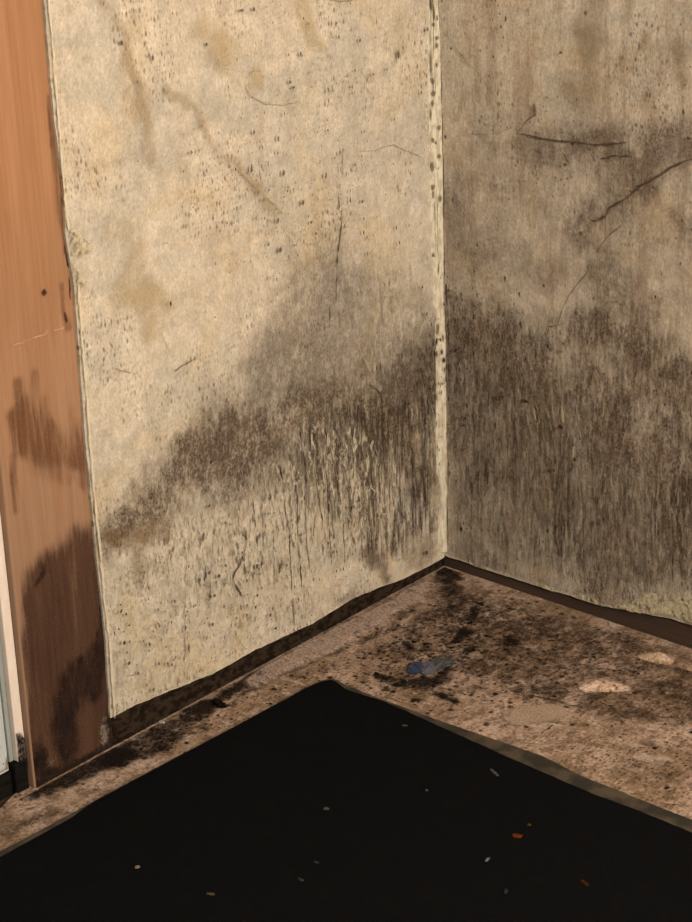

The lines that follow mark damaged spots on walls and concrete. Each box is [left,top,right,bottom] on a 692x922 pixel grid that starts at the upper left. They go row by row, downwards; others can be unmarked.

damp [418,0,446,151]
damp [255,62,395,264]
crack [470,116,632,164]
damp [523,89,692,205]
crack [588,159,692,245]
crack [542,268,591,362]
damp [3,287,692,800]